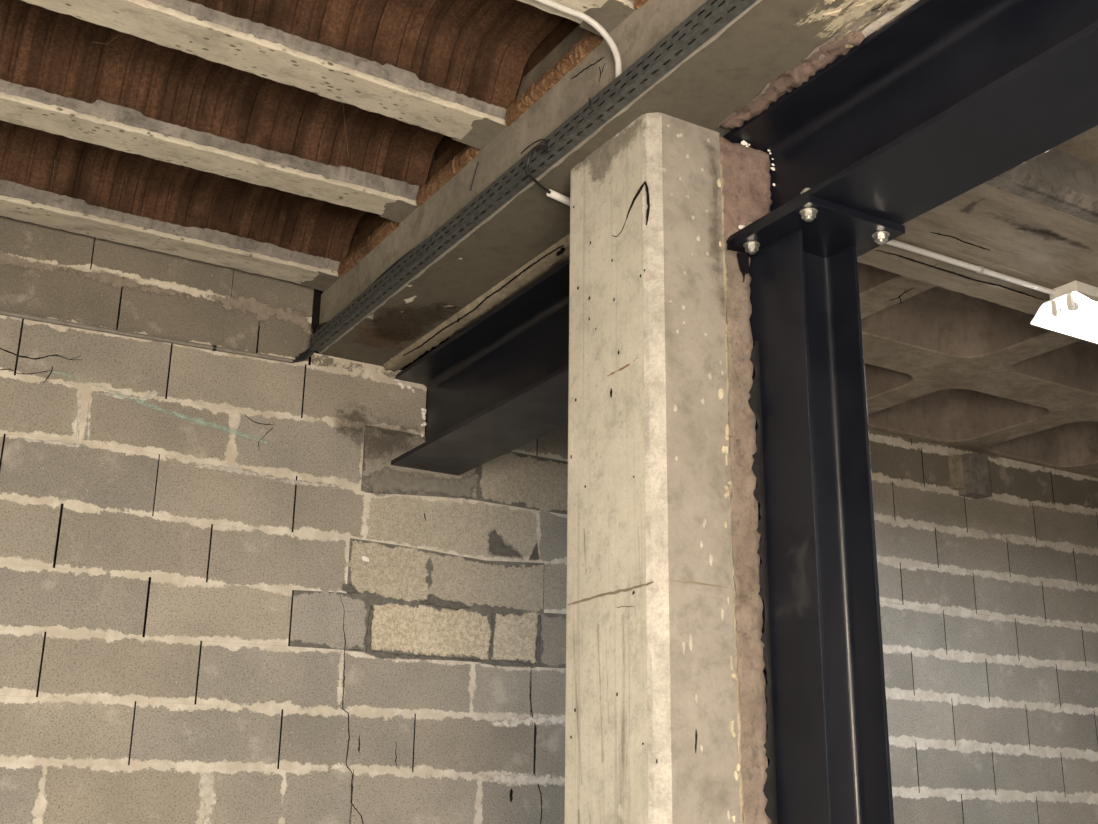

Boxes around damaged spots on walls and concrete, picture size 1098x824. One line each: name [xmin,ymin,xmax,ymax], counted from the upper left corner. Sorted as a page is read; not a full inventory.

peeling [796,0,910,49]
crack [0,348,82,383]
crack [339,593,364,824]